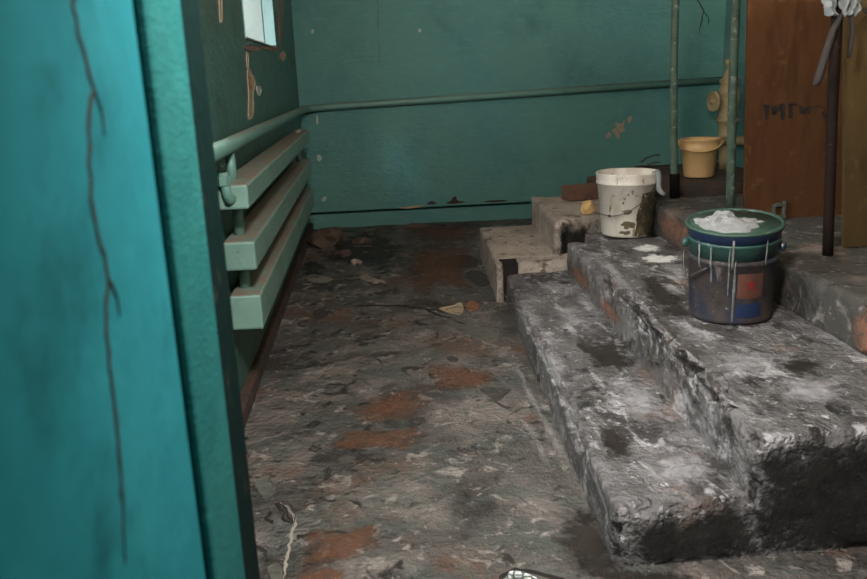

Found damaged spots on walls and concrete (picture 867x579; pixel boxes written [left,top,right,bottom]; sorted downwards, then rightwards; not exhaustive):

peeling [243,0,285,121]
crack [71,0,126,566]
damp [561,443,867,579]